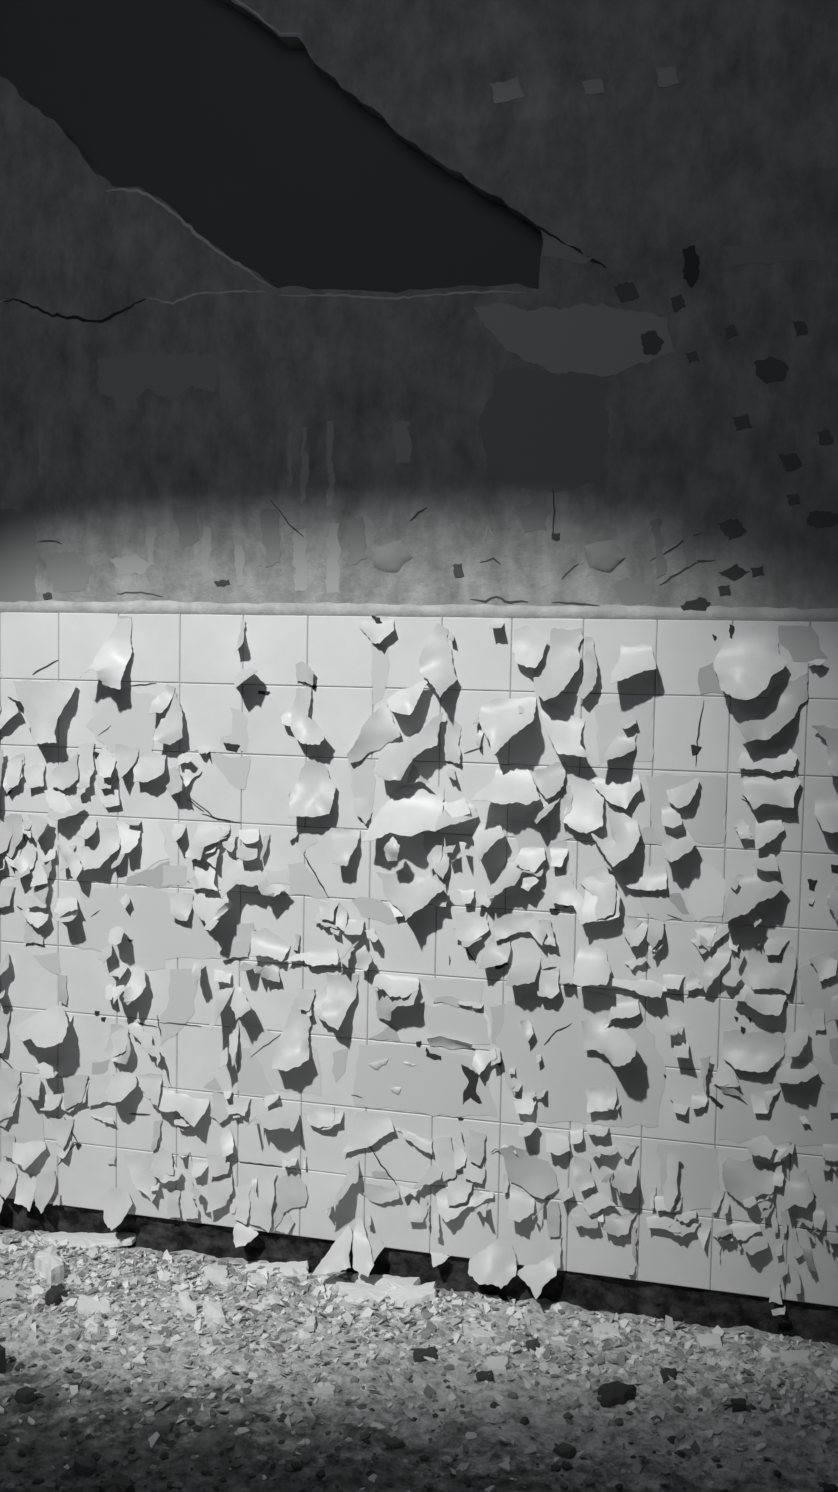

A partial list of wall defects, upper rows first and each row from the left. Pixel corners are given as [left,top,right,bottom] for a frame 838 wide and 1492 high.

crack [0,188,526,323]
spalling [0,0,700,377]
peeling [0,616,838,1316]